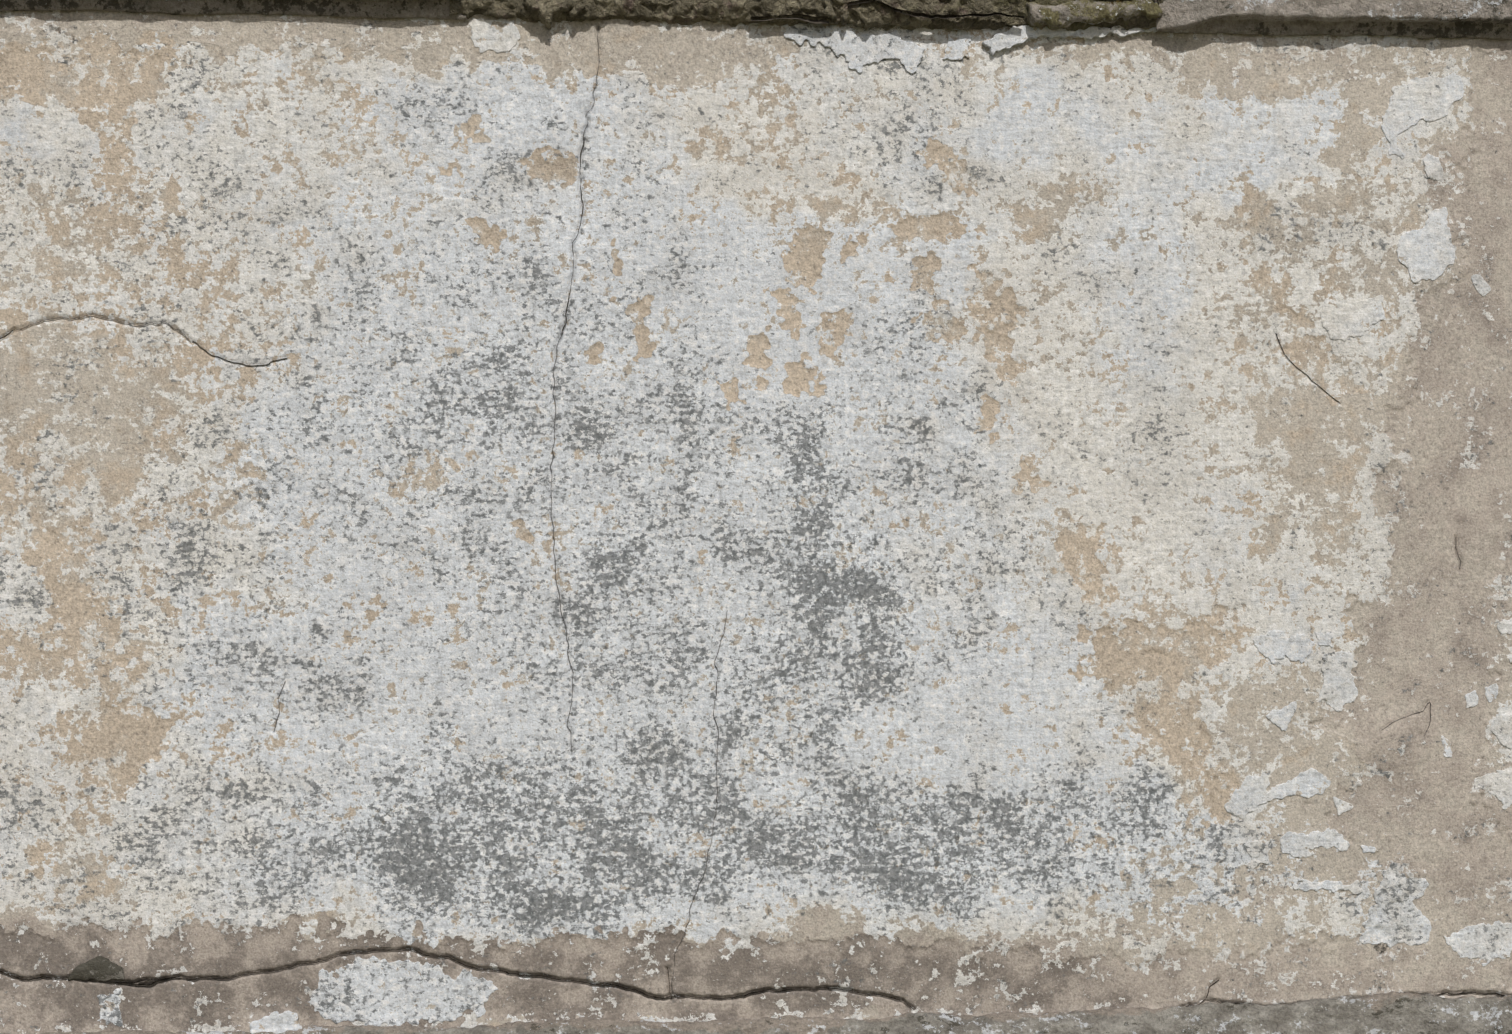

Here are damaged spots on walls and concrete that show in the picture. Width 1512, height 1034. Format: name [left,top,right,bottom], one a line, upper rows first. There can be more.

peeling [0,10,427,176]
spalling [443,0,1163,90]
peeling [1162,33,1400,104]
crack [0,314,287,366]
crack [550,26,600,748]
peeling [716,221,869,411]
peeling [1273,38,1512,999]
peeling [1068,598,1334,829]
crack [0,610,914,1010]
peeling [0,911,1388,1034]
crack [1185,979,1240,1007]
crack [1436,990,1505,998]